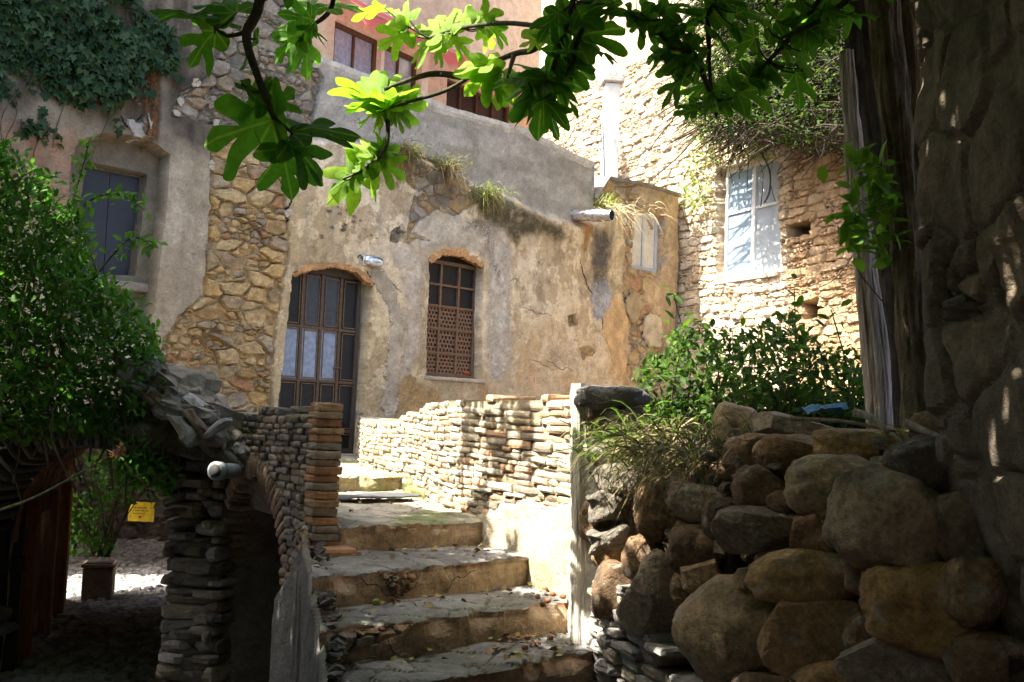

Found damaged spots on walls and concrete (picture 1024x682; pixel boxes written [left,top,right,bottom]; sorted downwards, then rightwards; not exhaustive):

flaking render [390,152,477,244]
water stain [591,231,613,319]
flaking render [602,291,664,386]